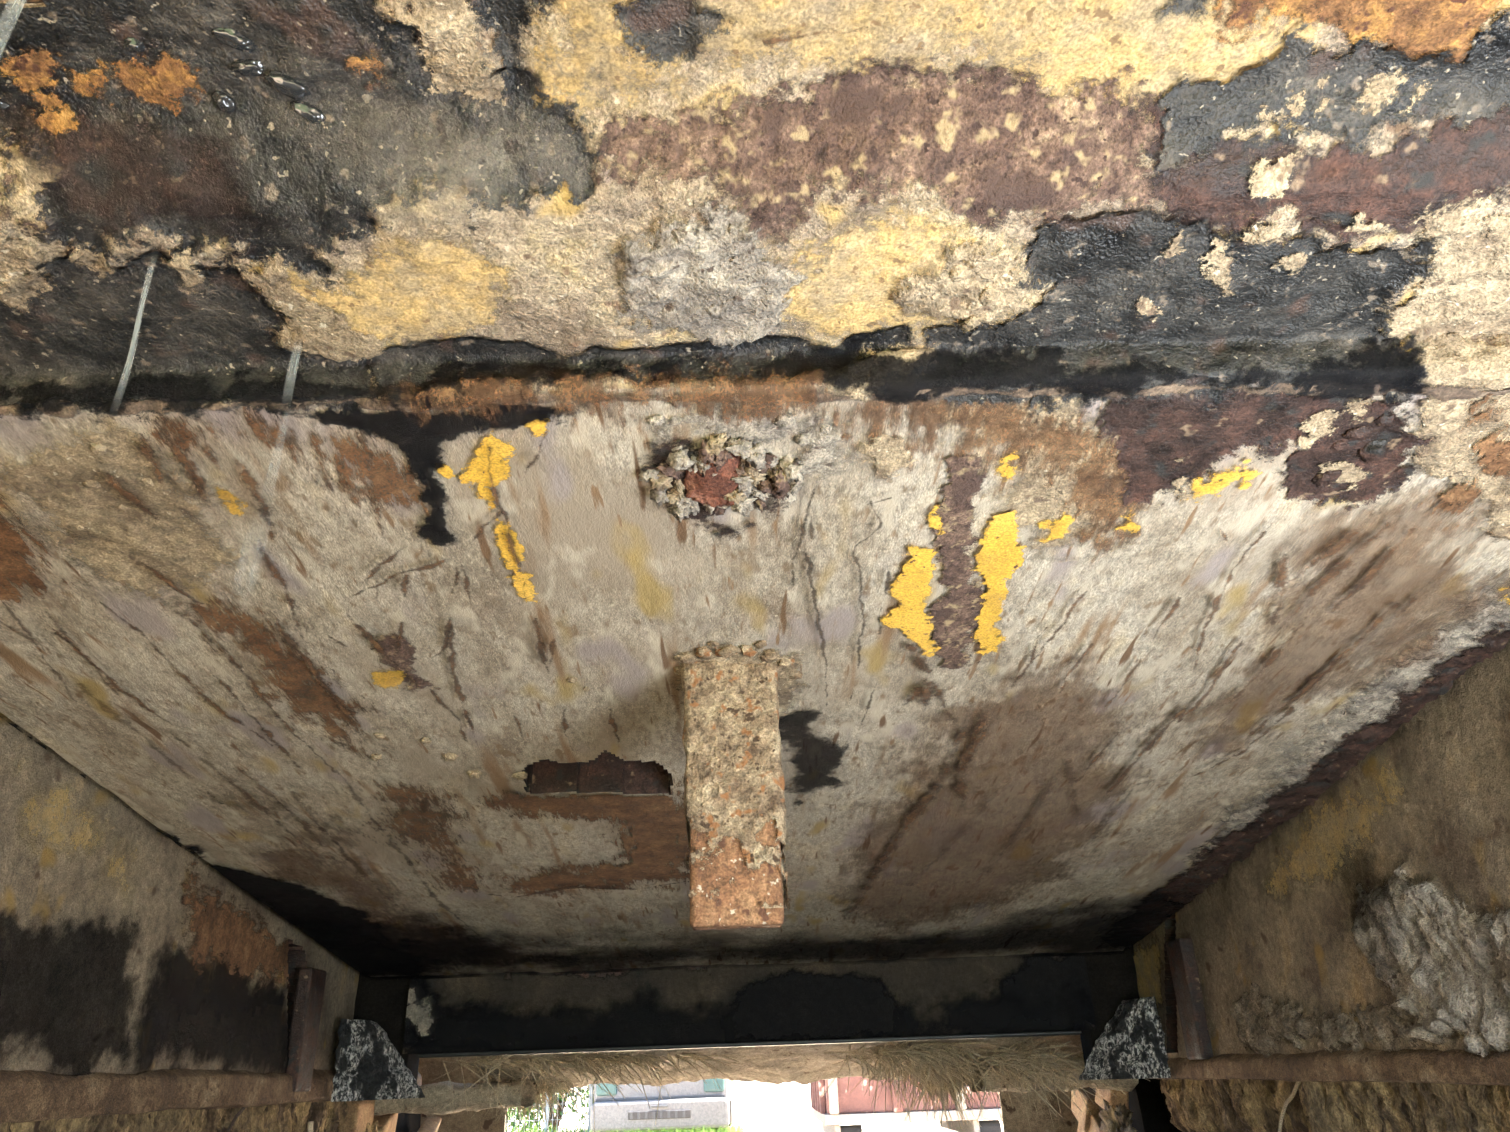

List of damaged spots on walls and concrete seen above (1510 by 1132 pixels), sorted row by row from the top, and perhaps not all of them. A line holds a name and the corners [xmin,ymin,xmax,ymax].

corrosion [0,45,250,249]
corrosion [344,51,389,92]
corrosion [1208,0,1502,64]
corrosion [0,494,186,773]
corrosion [99,406,690,933]
leakage [779,710,848,805]
crack [791,491,898,721]
corrosion [353,353,1510,932]
leakage [186,845,387,933]